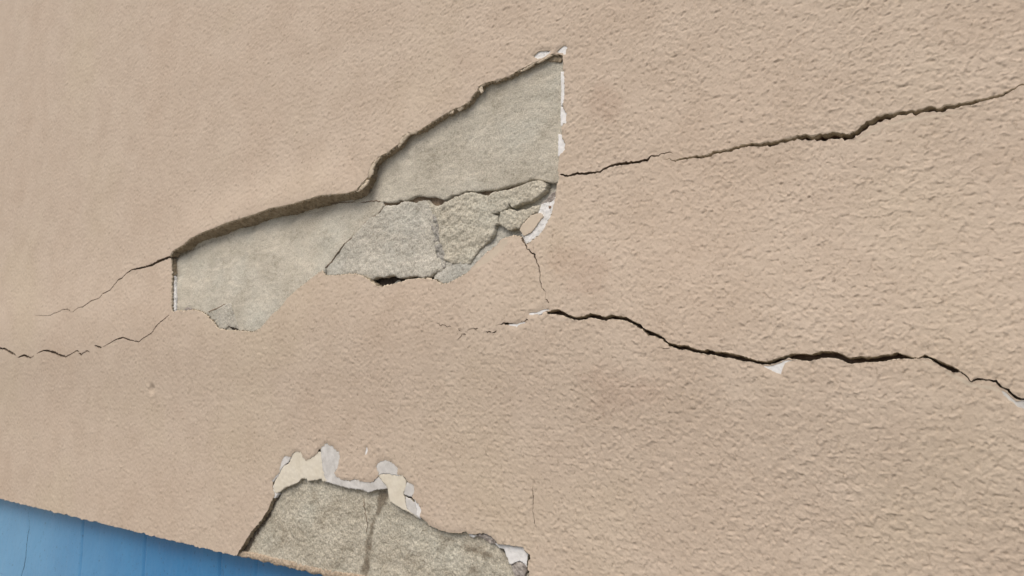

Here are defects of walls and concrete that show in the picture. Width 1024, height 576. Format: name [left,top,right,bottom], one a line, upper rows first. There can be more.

spalling [170,45,567,332]
crack [321,84,1024,217]
crack [0,315,169,358]
crack [40,256,175,316]
crack [438,238,1024,401]
spalling [237,443,530,576]